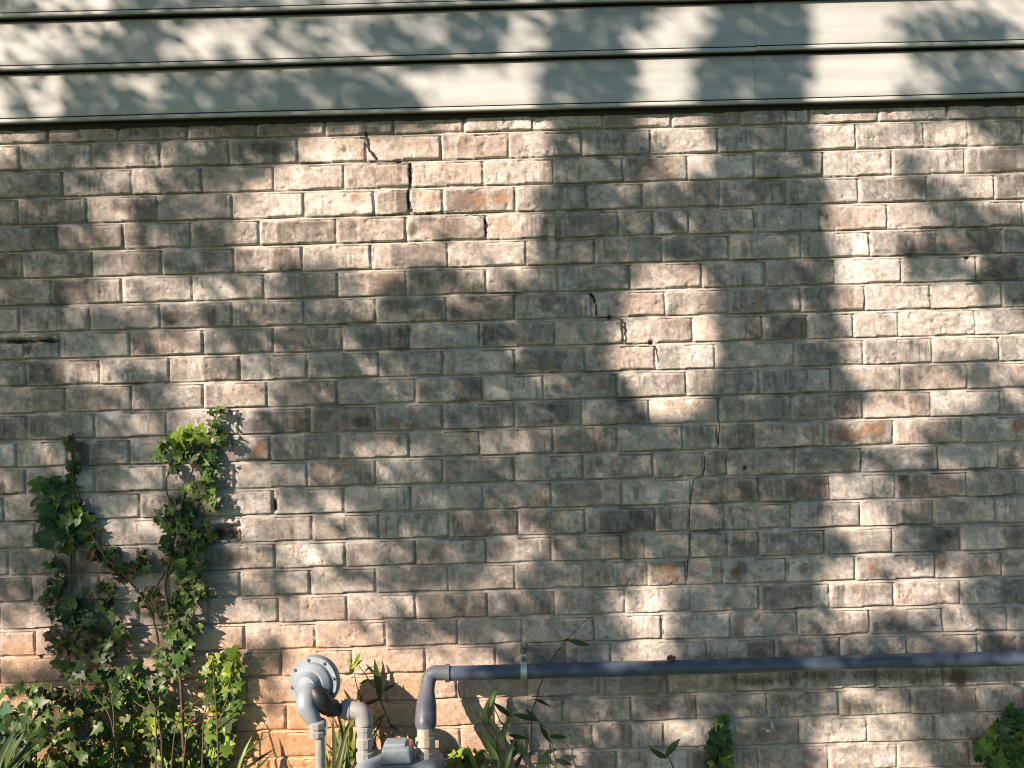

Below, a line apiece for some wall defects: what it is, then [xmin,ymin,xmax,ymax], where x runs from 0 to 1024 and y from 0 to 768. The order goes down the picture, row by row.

crack [364,131,377,160]
crack [406,162,488,236]
crack [589,293,658,363]
crack [686,396,720,579]